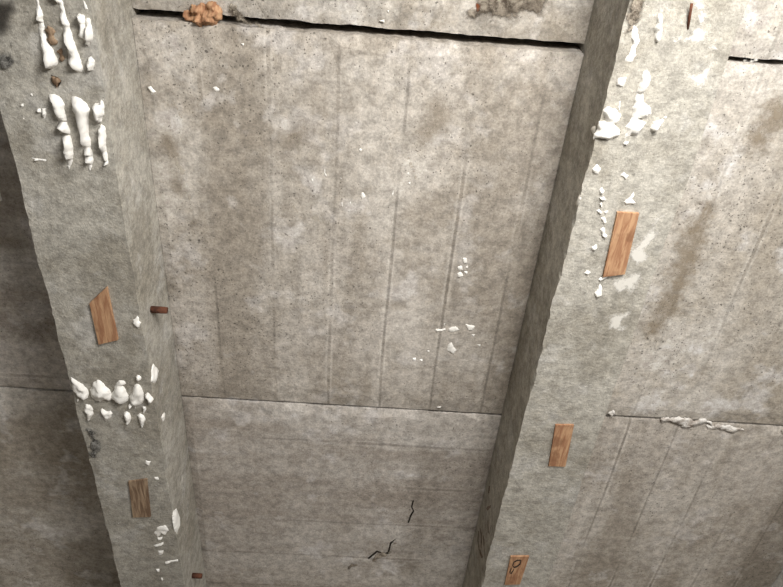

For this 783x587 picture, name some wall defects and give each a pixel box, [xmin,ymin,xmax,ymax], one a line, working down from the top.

spalling [467,0,547,22]
crack [368,539,395,559]